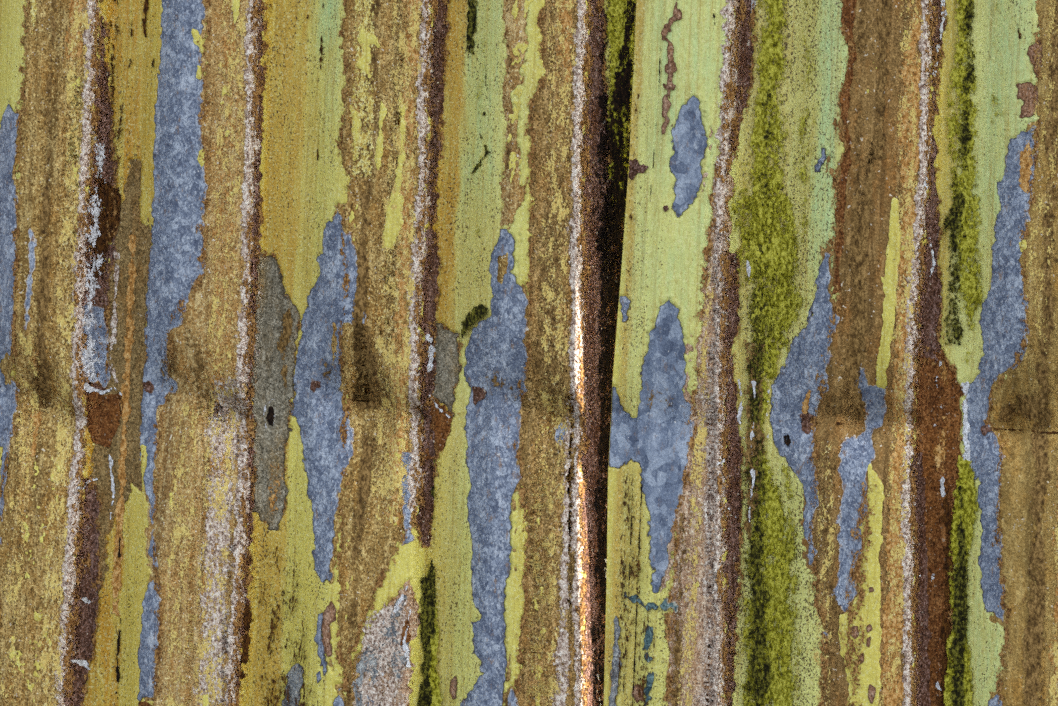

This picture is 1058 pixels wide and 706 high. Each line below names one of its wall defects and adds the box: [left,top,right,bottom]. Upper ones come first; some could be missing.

corrosion [0,0,120,706]
peeling [79,0,208,616]
corrosion [144,0,269,706]
peeling [248,211,367,583]
corrosion [329,0,451,706]
peeling [420,0,533,706]
corrosion [502,0,624,706]
peeling [609,300,695,593]
corrosion [660,0,758,706]
peeling [770,252,840,565]
corrosion [800,0,965,706]
peeling [961,125,1038,622]